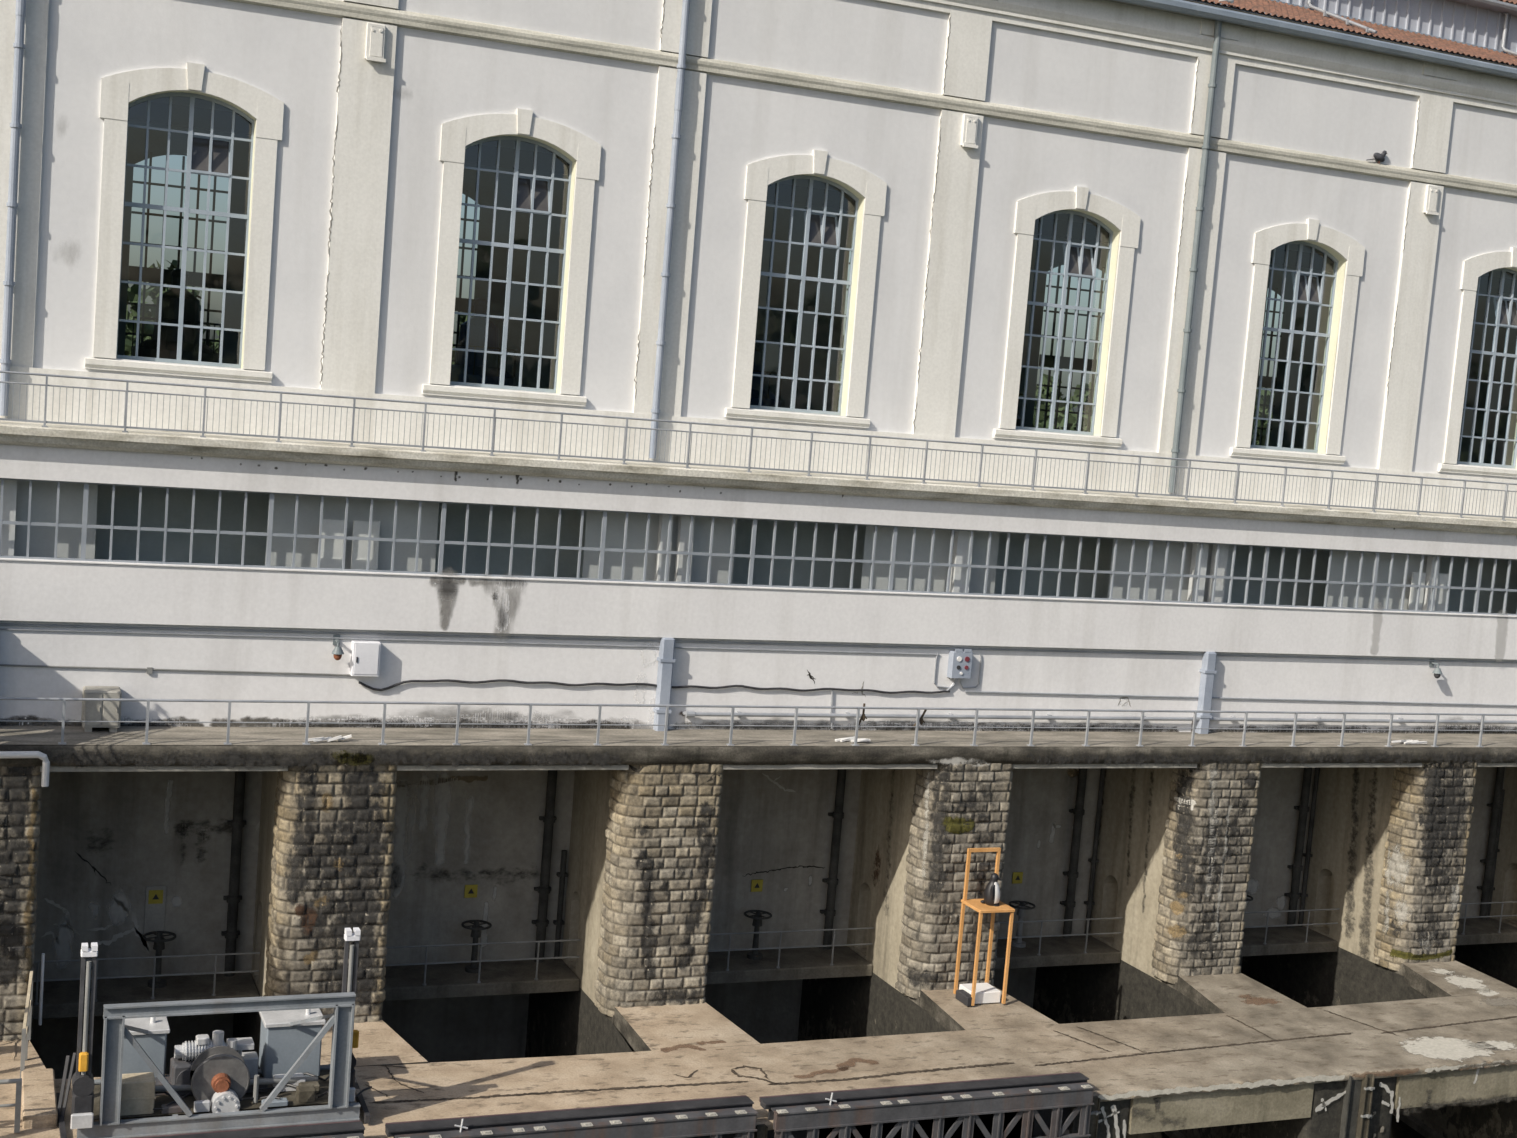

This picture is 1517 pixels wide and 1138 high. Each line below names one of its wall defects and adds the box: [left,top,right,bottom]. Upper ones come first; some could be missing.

water stain [431,570,516,633]
water stain [0,716,82,726]
water stain [120,711,650,729]
water stain [674,721,1178,732]
water stain [54,749,620,948]
water stain [922,758,986,877]
water stain [1027,723,1517,960]